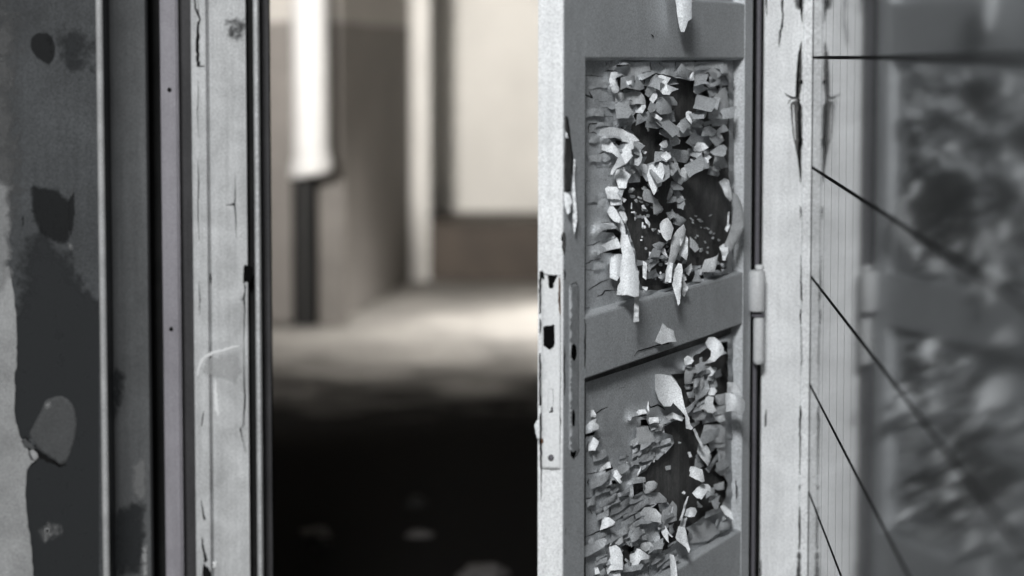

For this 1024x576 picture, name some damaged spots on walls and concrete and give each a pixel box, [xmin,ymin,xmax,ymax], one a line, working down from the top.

flaking render [0,9,74,576]
peeling [561,60,745,322]
peeling [584,323,745,576]